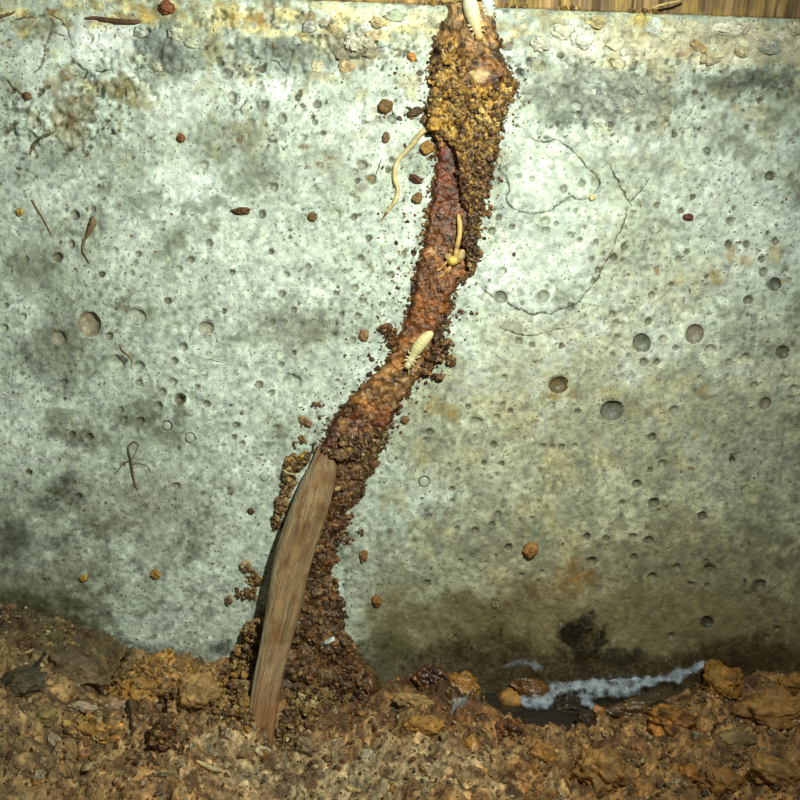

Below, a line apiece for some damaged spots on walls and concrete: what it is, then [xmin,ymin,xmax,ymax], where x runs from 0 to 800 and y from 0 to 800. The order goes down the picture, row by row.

crack [485,138,650,336]
damp [358,610,785,708]